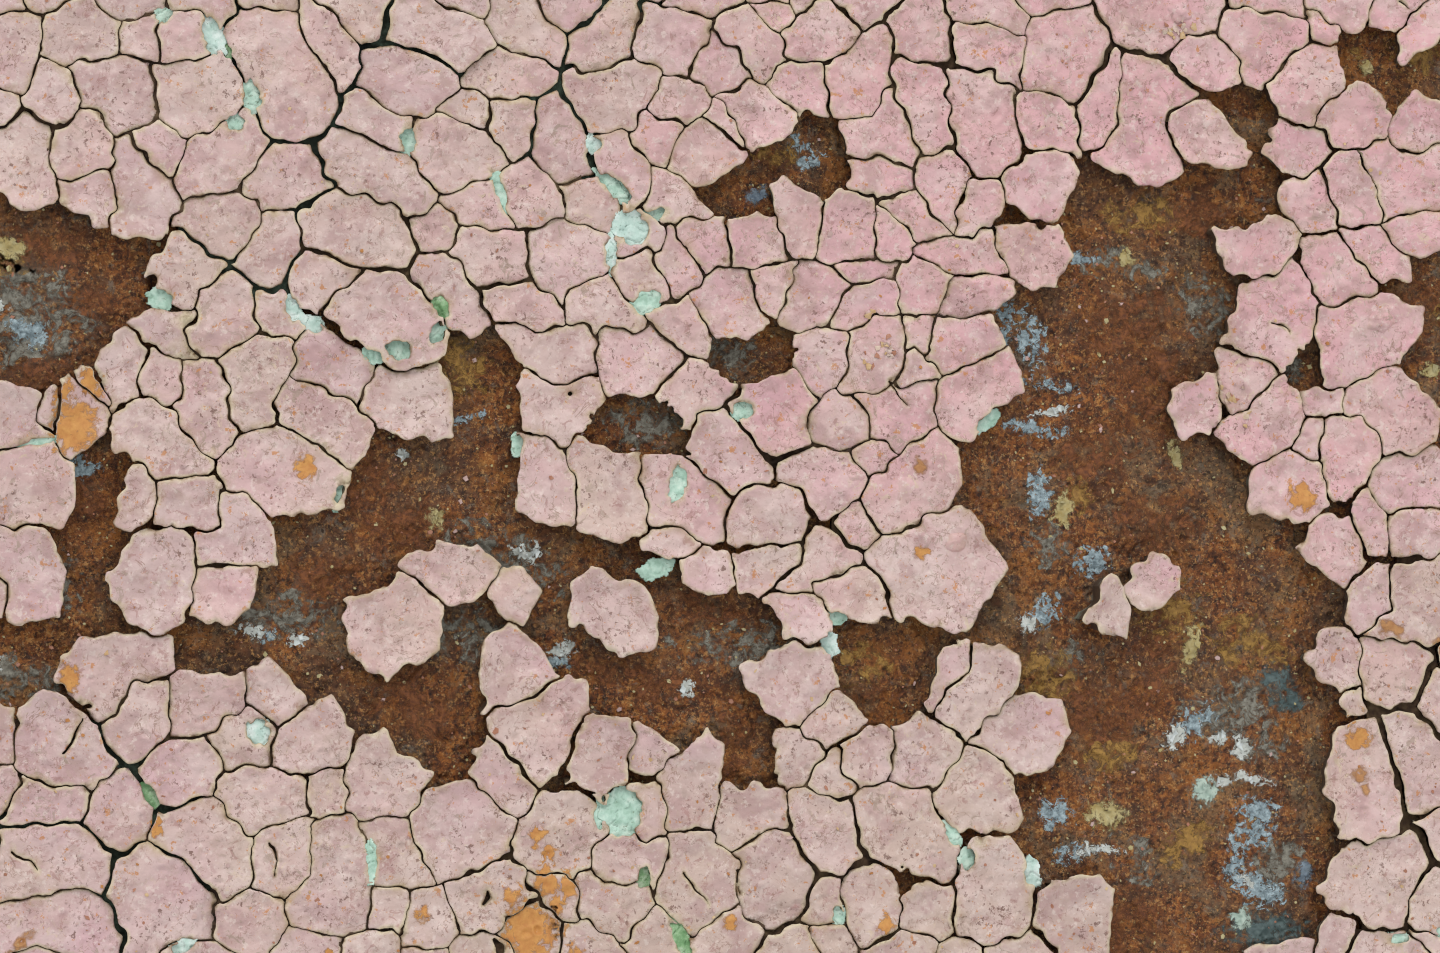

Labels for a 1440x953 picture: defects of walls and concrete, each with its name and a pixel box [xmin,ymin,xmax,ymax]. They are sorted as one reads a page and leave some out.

crack [169,0,466,302]
peeling [562,0,1253,278]
rust [1320,12,1440,117]
rust [0,192,177,418]
rust [0,302,839,807]
peeling [0,0,1074,953]
rust [826,79,1373,953]
peeling [1093,0,1440,718]
crack [0,720,211,953]
crack [754,793,882,953]
peeling [1242,711,1440,953]
crack [1345,643,1440,953]